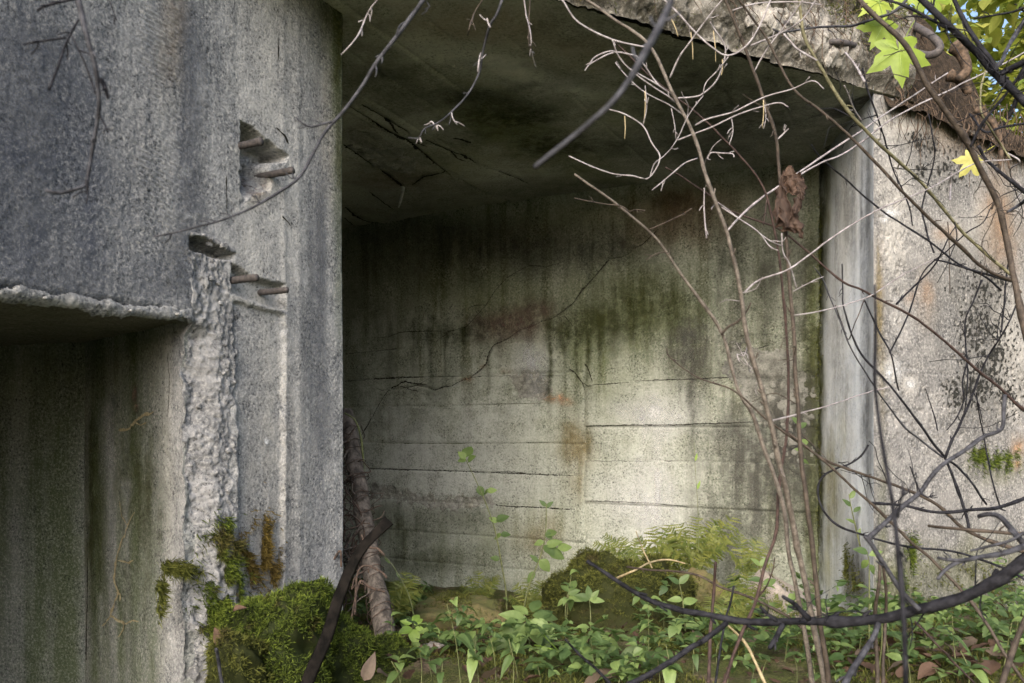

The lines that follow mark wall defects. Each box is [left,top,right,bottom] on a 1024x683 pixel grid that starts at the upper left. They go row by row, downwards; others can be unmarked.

spalling [241,166,295,180]
crack [344,105,527,226]
crack [343,230,657,444]
water stain [549,315,602,377]
spalling [0,231,289,683]